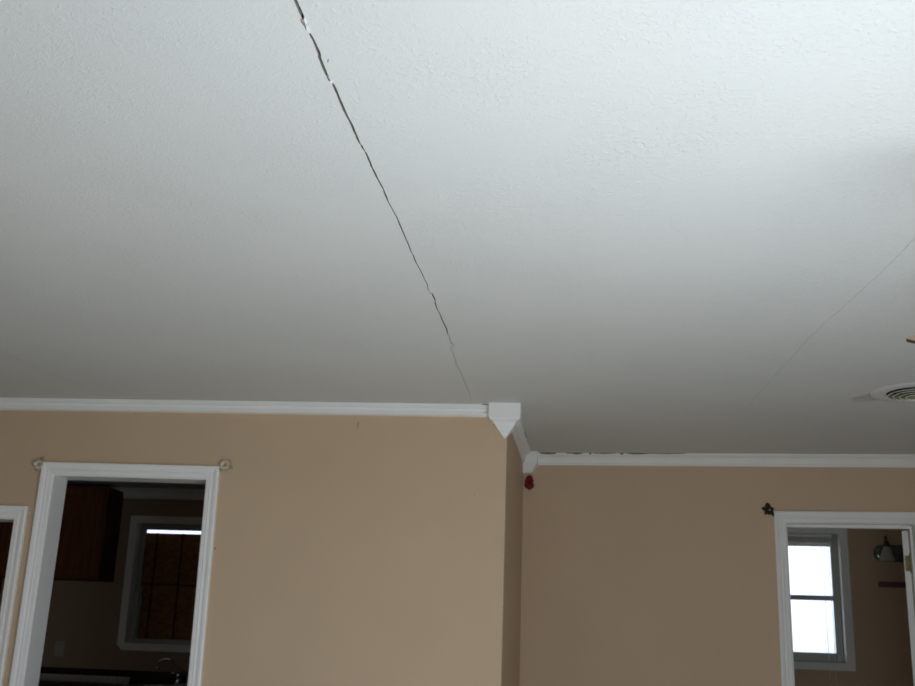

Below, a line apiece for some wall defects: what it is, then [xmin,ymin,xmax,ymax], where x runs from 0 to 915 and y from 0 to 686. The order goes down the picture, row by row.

crack [294,0,487,405]